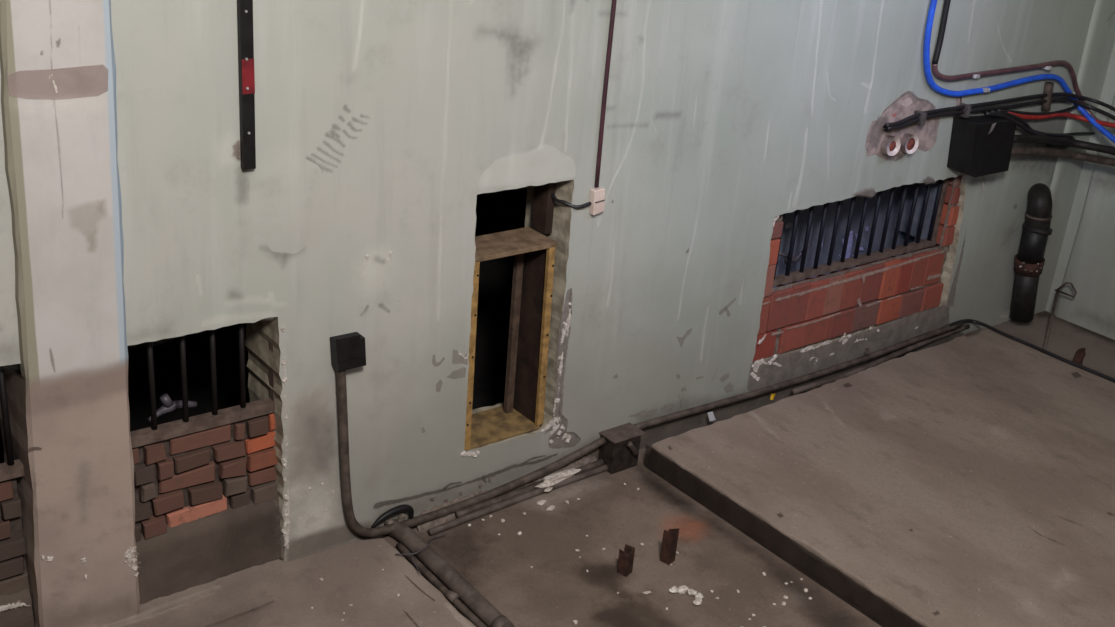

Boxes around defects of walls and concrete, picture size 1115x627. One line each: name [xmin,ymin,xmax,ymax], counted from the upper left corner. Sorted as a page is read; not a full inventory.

spalling [865,91,963,161]
spalling [541,288,581,449]